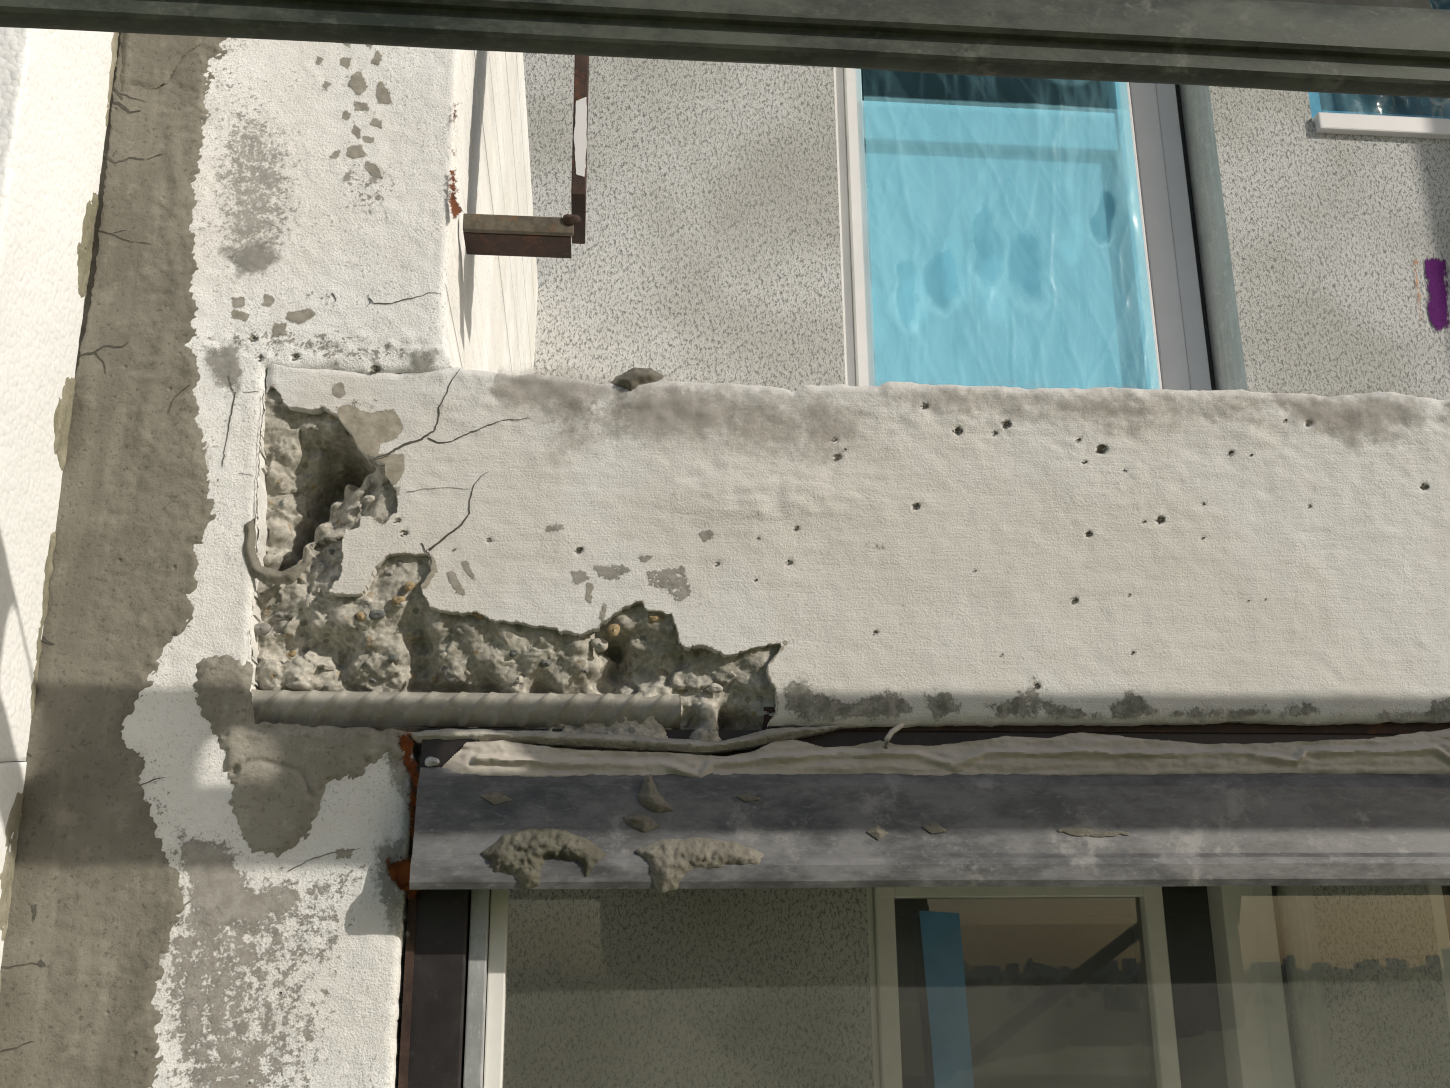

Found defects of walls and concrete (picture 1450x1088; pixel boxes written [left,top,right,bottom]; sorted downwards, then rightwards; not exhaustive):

peeling [323,43,395,230]
crack [372,369,531,462]
crack [407,472,487,571]
spalling [138,291,961,1088]
spalling [985,677,1320,723]
spalling [1380,697,1450,722]
corrosion [398,731,419,840]
corrosion [385,856,423,899]